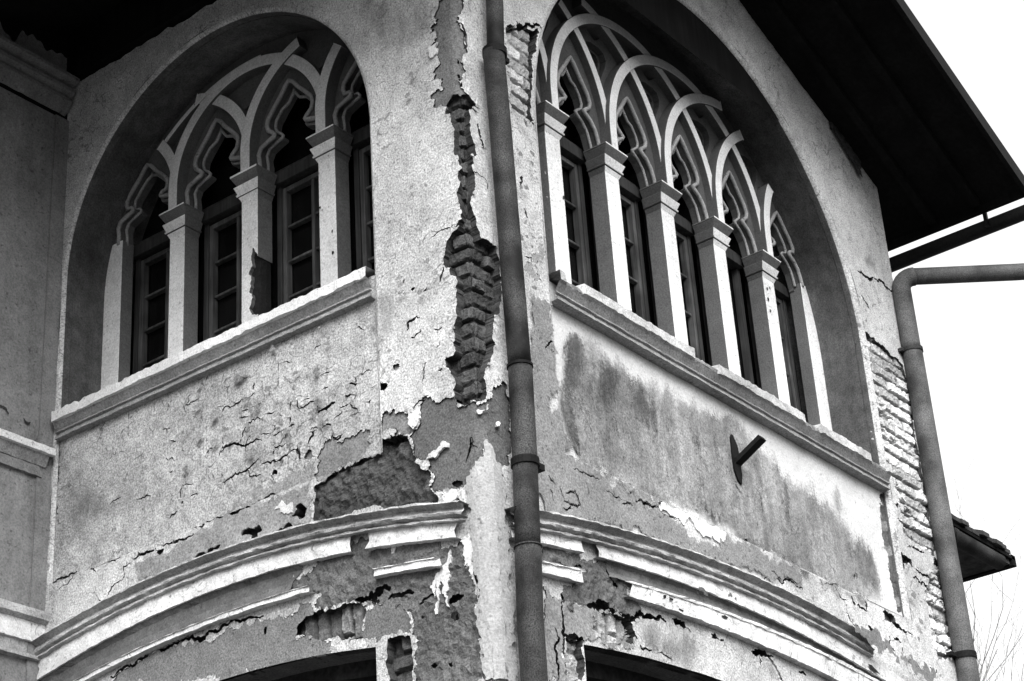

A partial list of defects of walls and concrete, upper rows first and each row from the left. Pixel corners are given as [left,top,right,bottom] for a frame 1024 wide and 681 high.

flaking render [506,20,535,127]
peeling [135,0,511,580]
flaking render [114,535,485,681]
peeling [542,547,698,681]
water stain [561,332,883,602]
flaking render [852,338,952,681]